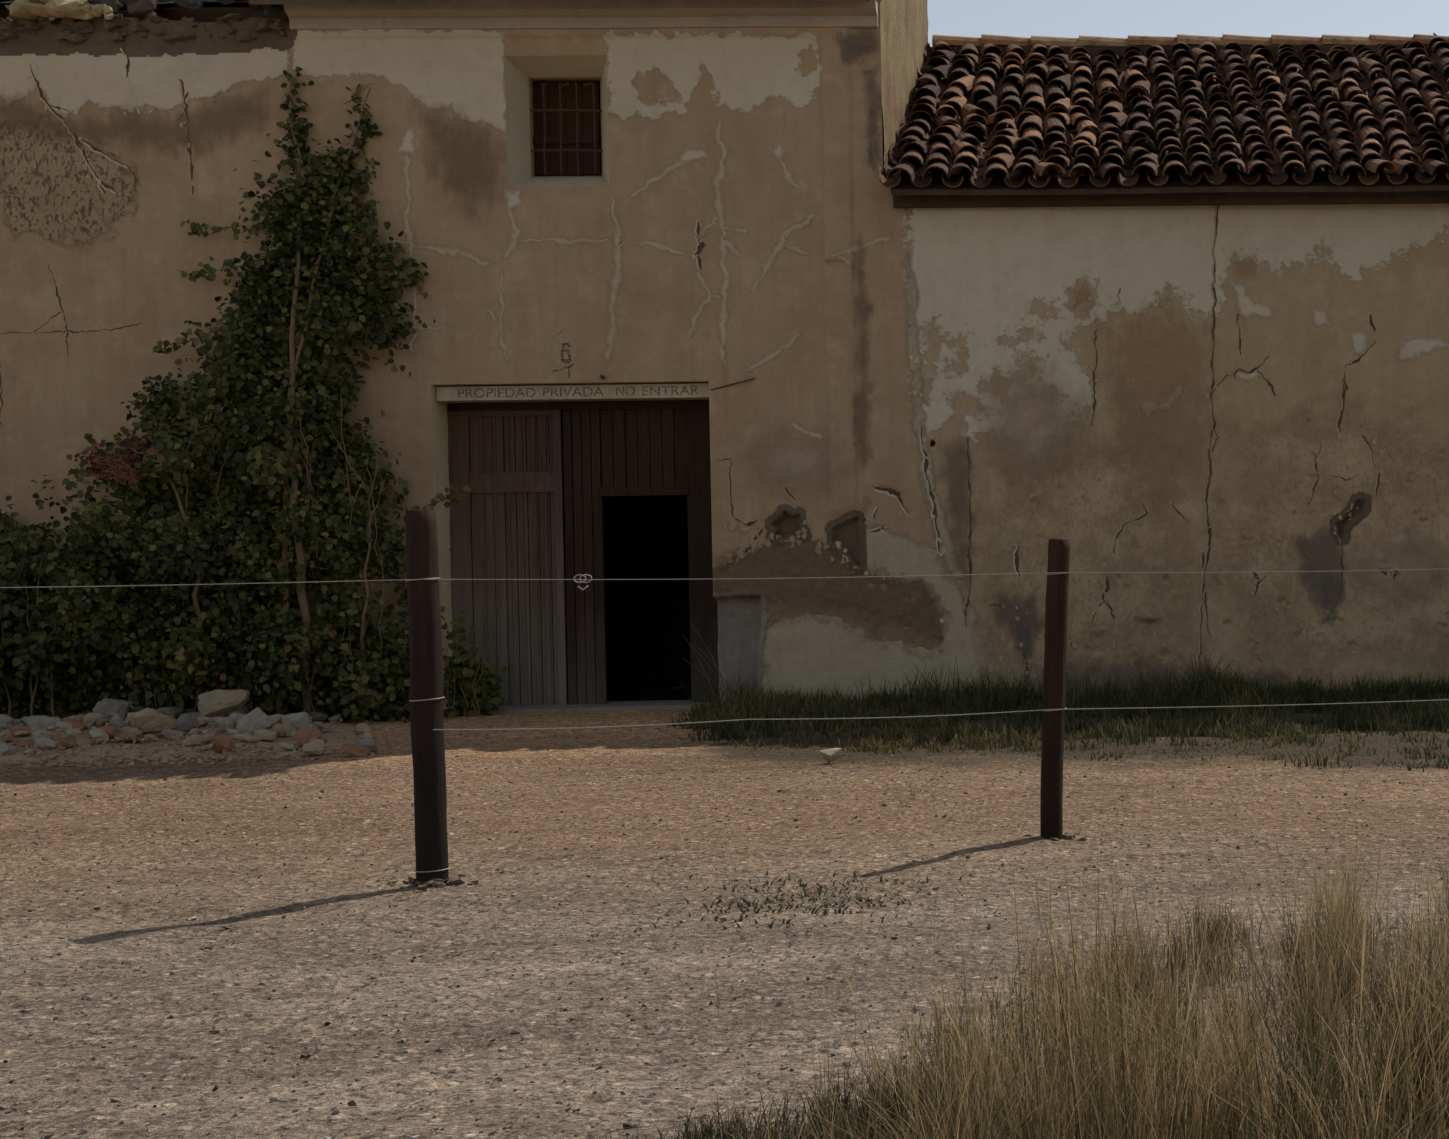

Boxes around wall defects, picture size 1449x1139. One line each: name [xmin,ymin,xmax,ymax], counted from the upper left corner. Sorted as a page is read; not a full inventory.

crack [27,64,129,194]
crack [120,47,130,77]
peeling [0,0,507,246]
peeling [602,28,823,121]
crack [0,265,142,427]
peeling [713,192,1449,704]
crack [1089,329,1098,426]
crack [1091,205,1276,674]